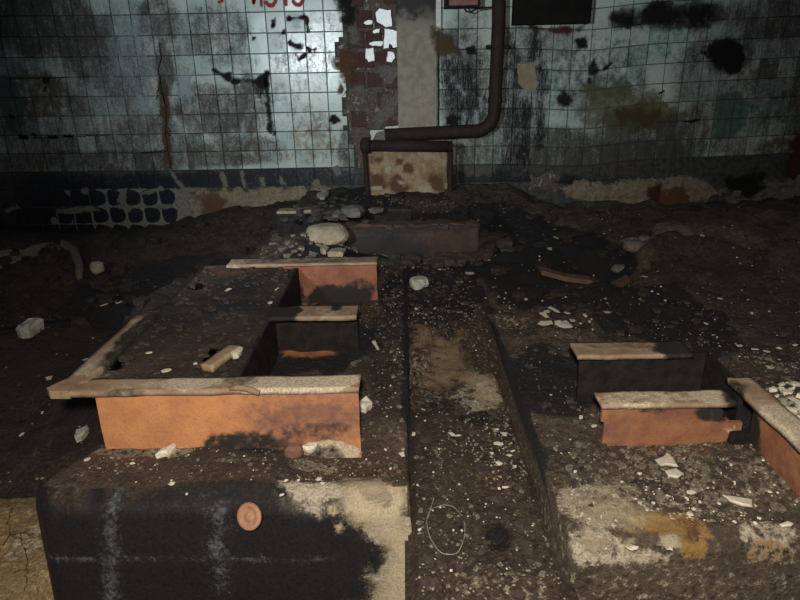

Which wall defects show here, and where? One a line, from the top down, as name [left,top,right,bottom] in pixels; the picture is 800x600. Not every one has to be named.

crack [141,42,174,169]
leakage [252,70,274,134]
peeling [340,0,398,140]
corrosion [431,26,465,56]
leakage [446,96,484,125]
leakage [512,26,551,167]
spalling [51,165,342,230]
spalling [417,183,435,193]
spalling [529,170,800,205]